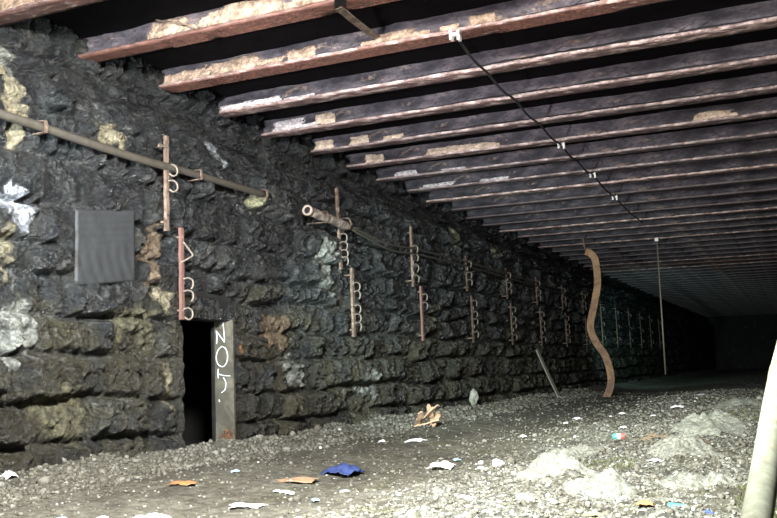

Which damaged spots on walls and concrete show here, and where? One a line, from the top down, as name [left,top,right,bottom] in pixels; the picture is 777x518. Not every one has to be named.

peeling [147,0,324,40]
peeling [163,45,316,84]
peeling [692,110,738,121]